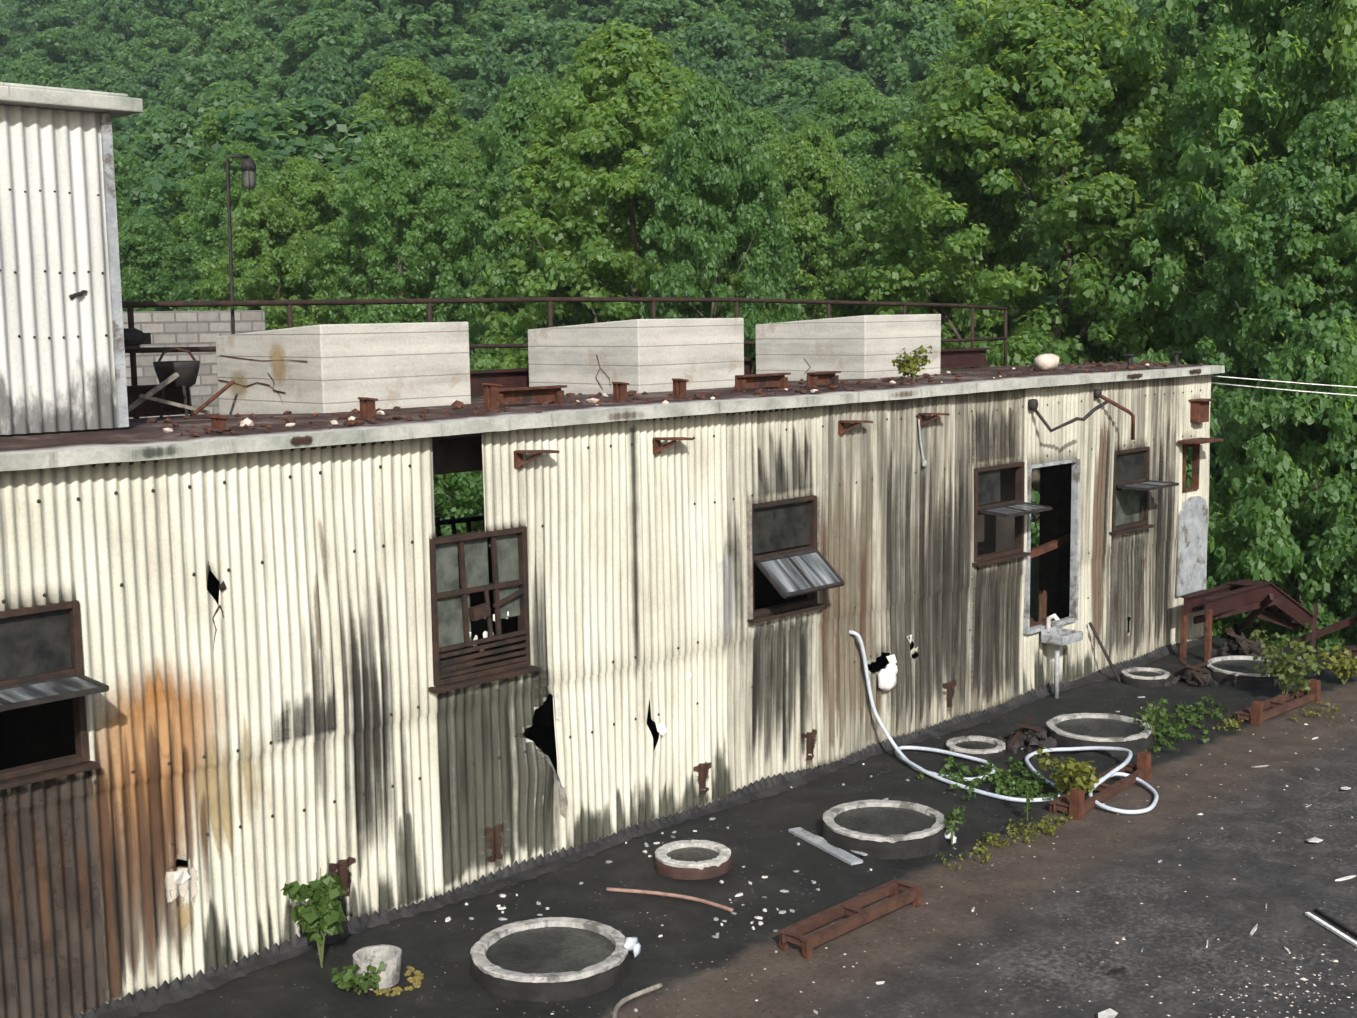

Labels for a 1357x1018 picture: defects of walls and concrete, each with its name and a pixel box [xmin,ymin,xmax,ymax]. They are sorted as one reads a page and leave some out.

water stain [976,412,1012,442]
water stain [1106,423,1175,658]
water stain [724,526,743,637]
water stain [752,455,1022,760]
water stain [1039,592,1047,621]
water stain [1035,651,1043,690]
water stain [1062,648,1091,683]
water stain [312,530,419,905]
corrosion [693,762,712,801]
corrosion [95,672,252,997]
corrosion [328,857,356,906]